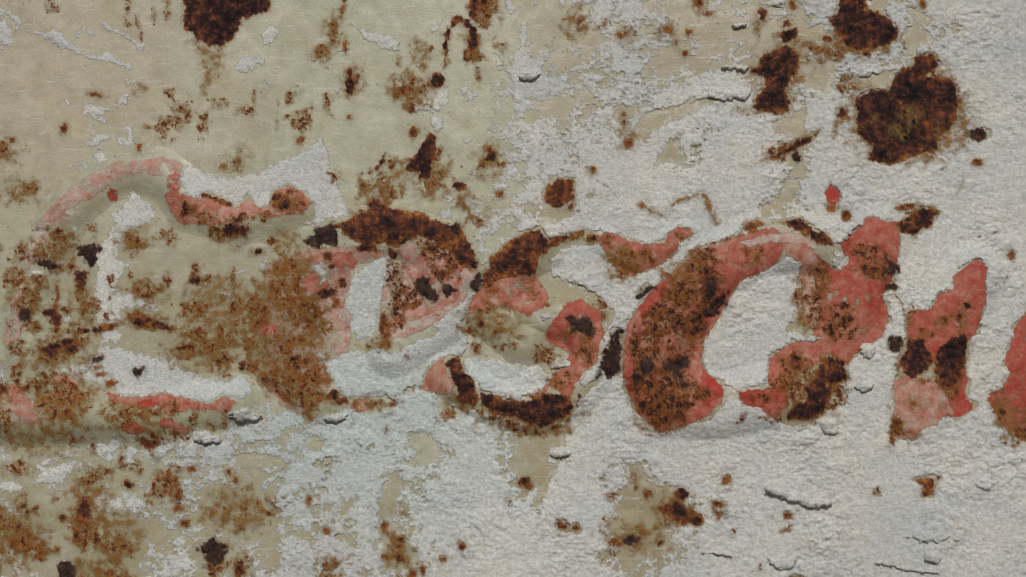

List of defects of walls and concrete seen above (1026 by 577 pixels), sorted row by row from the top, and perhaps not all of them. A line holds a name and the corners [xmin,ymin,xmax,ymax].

corrosion [738,0,904,115]
corrosion [763,52,969,165]
peeling [0,0,350,346]
peeling [460,0,798,354]
corrosion [0,0,857,475]
peeling [107,392,236,416]
peeling [258,246,395,360]
peeling [699,227,821,392]
corrosion [888,302,975,399]
peeling [0,438,95,497]
corrosion [381,521,425,577]
corrosion [600,473,723,557]